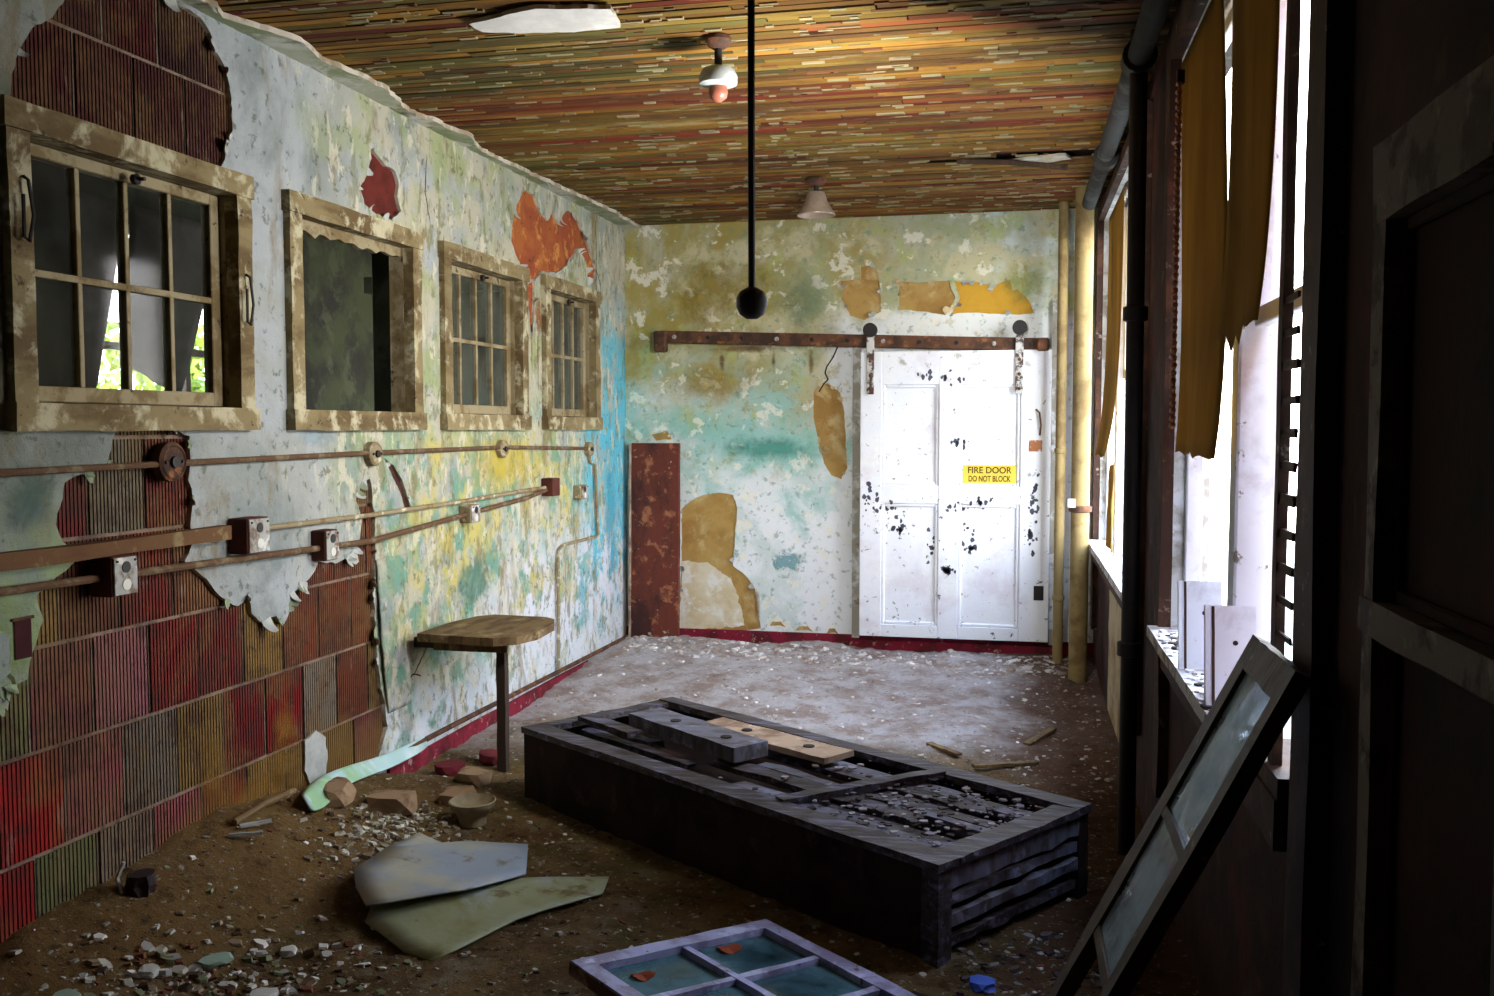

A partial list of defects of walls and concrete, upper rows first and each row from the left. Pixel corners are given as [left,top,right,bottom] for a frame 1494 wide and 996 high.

flaking render [11,0,233,165]
flaking render [359,143,400,222]
flaking render [511,179,595,333]
peeling [839,262,1033,320]
peeling [680,493,838,634]
peeling [862,481,909,536]
peeling [926,527,956,575]
peeling [945,496,993,554]
peeling [1024,473,1040,557]
flaking render [0,430,383,943]